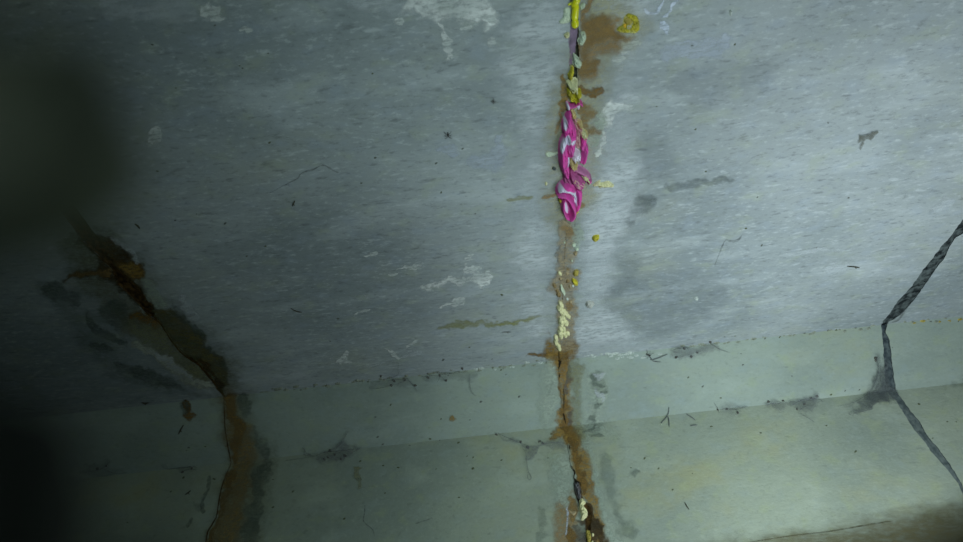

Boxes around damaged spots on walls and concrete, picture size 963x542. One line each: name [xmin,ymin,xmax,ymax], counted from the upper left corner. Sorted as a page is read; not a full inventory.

damp [395,0,497,59]
crack [569,0,579,79]
corrosion [550,0,634,150]
corrosion [64,236,182,338]
crack [82,234,231,542]
corrosion [529,341,609,542]
crack [563,413,593,542]
crack [881,220,963,493]